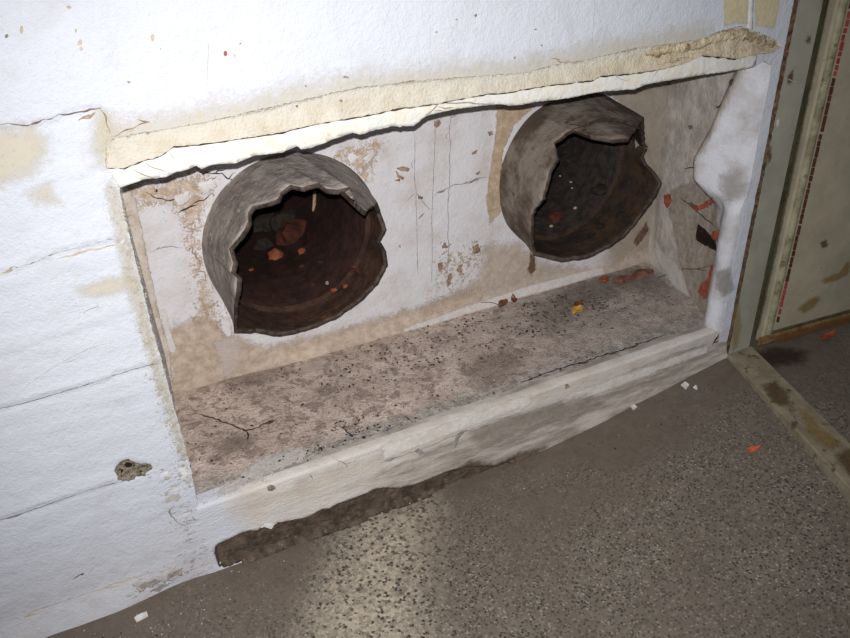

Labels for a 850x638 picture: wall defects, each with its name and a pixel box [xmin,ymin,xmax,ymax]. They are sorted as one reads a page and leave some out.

crack [0,108,150,137]
rust [633,221,648,246]
spalling [105,55,757,607]
crack [519,335,664,383]
crack [196,412,279,440]